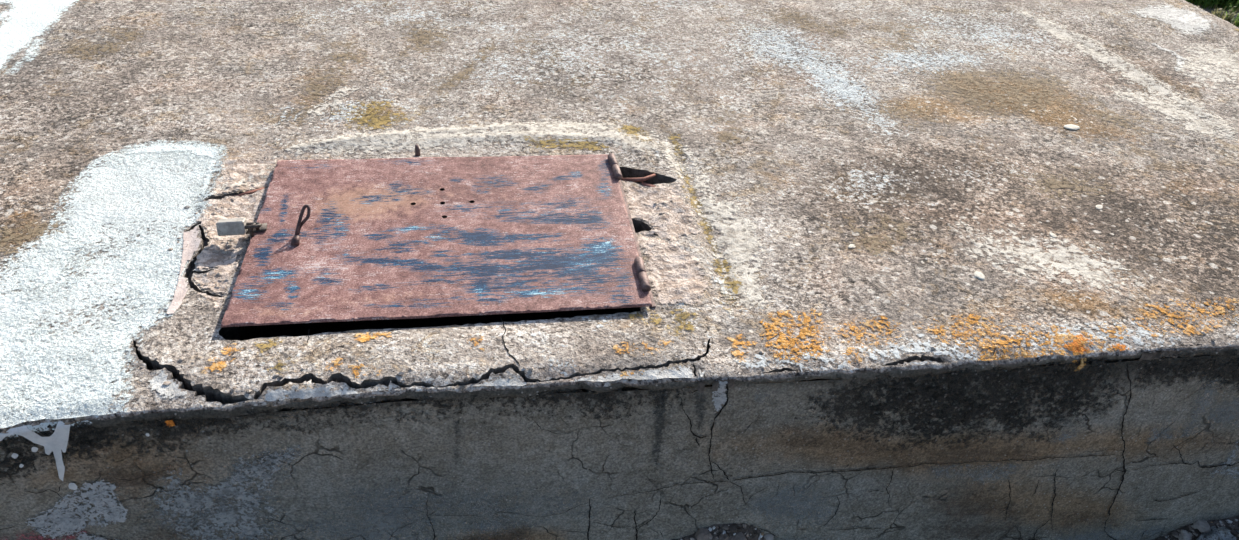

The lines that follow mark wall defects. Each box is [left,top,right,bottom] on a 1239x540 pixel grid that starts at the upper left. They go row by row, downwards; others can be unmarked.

crack [133,316,1239,540]
water stain [733,311,1239,450]